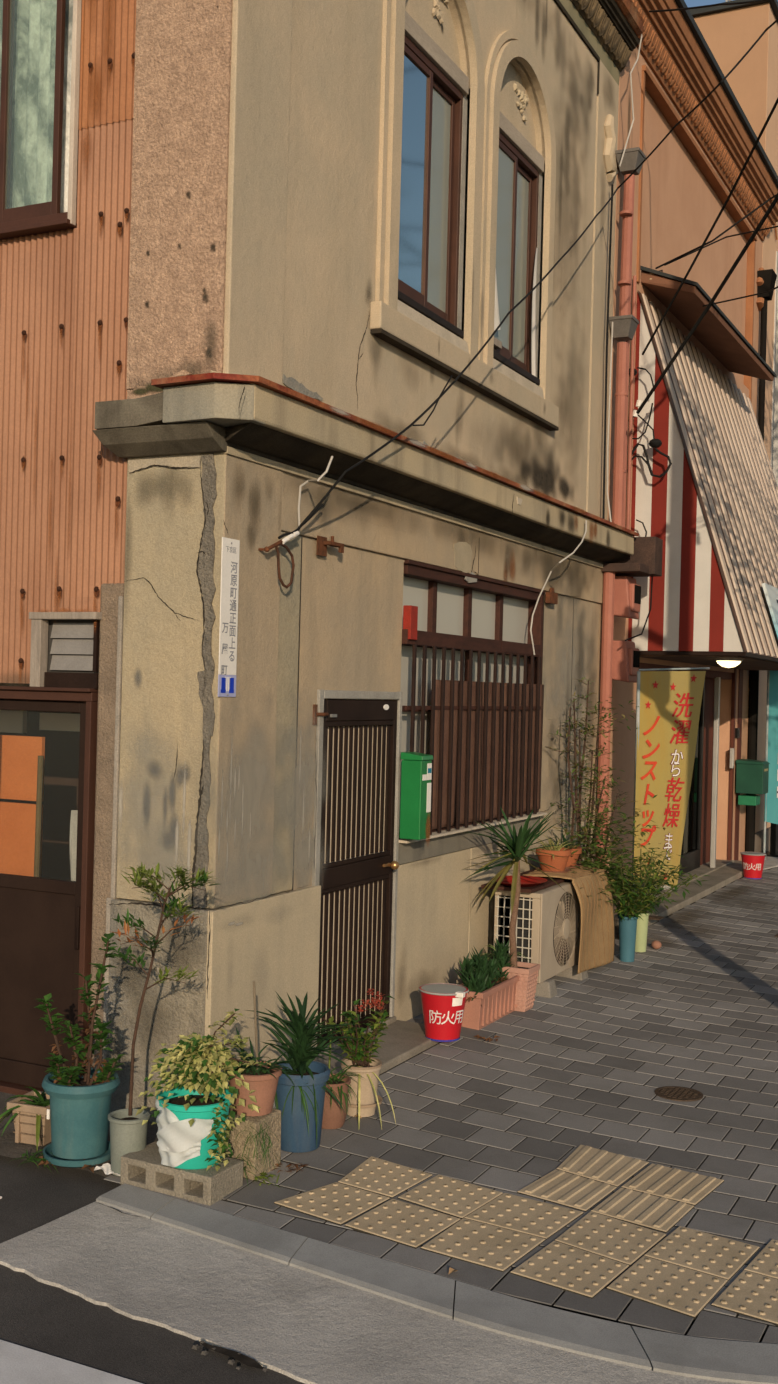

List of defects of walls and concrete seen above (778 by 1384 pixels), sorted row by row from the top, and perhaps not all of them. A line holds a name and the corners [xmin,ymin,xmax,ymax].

crack [109,453,317,987]
water stain [522,456,574,529]